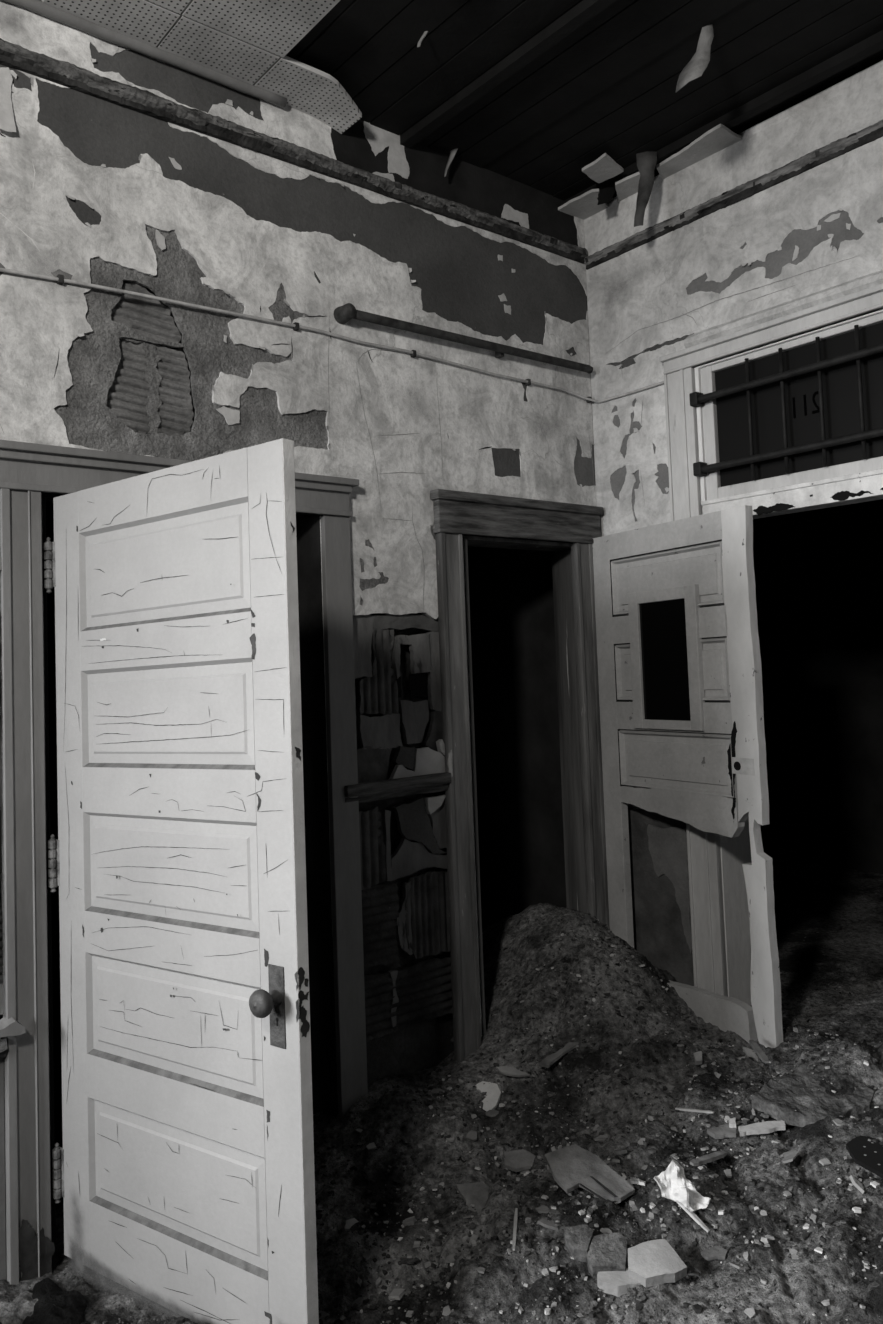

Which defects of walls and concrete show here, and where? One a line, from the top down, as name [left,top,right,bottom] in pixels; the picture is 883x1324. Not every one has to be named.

peeling [90,42,264,121]
peeling [0,64,588,345]
peeling [686,207,864,295]
spalling [54,226,331,461]
peeling [492,448,521,477]
peeling [574,398,642,522]
peeling [653,444,669,494]
spalling [353,539,445,783]
spalling [359,794,453,1042]